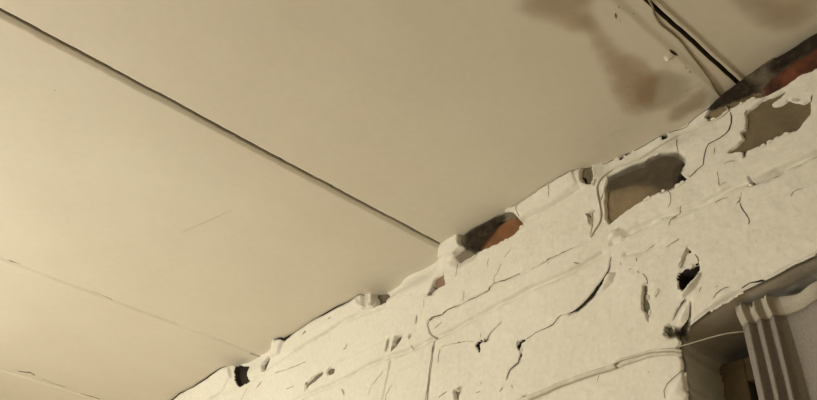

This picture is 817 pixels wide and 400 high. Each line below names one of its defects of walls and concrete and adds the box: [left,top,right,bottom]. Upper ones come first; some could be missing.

flaking render [707,47,817,153]
flaking render [582,167,665,224]
flaking render [674,162,689,188]
flaking render [451,212,523,263]
flaking render [425,275,445,298]
crack [411,190,699,400]
flaking render [679,250,700,283]